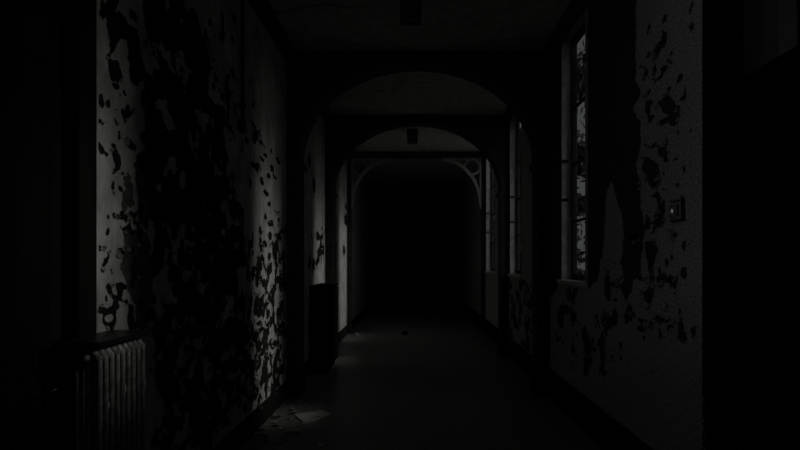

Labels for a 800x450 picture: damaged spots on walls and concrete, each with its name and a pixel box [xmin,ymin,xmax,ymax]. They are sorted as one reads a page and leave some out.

peeling [98,184,150,330]
peeling [99,0,168,193]
peeling [213,67,288,413]
peeling [548,49,561,299]
peeling [584,0,696,375]